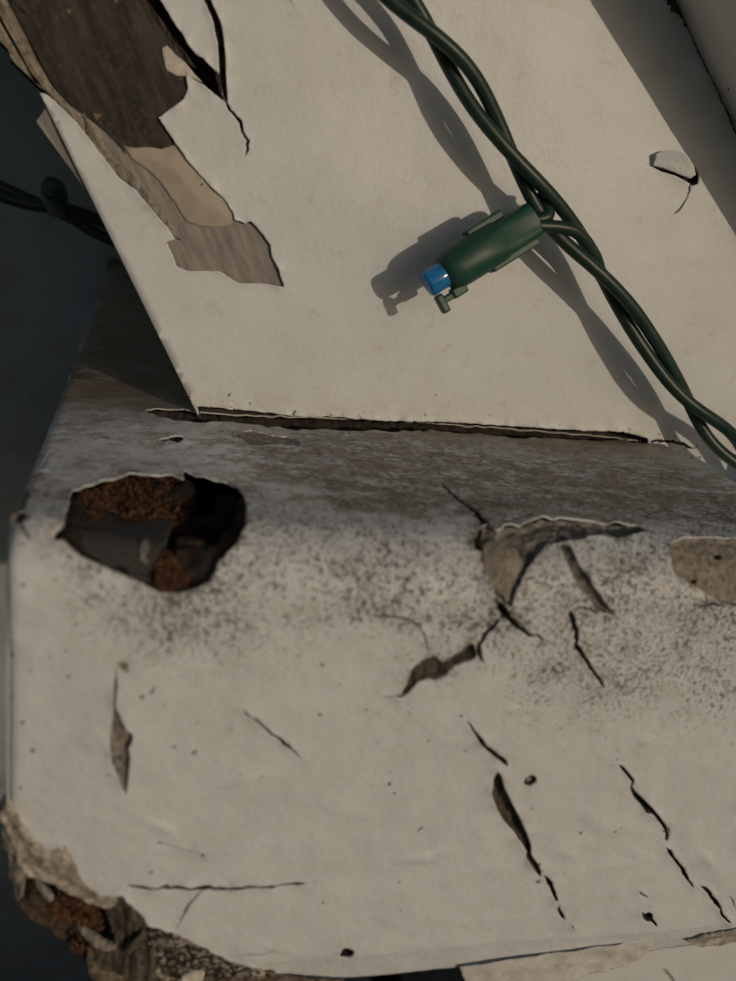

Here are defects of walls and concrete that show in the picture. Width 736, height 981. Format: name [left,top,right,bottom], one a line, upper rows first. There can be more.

peeling [0,0,284,287]
crack [204,0,250,155]
crack [650,439,692,449]
crack [377,486,645,698]
spalling [559,541,613,614]
peeling [671,538,736,608]
peeling [110,662,133,793]
spalling [0,793,344,981]
crack [128,882,304,924]
crack [467,722,574,929]
peeling [460,941,652,981]
crack [616,759,734,923]